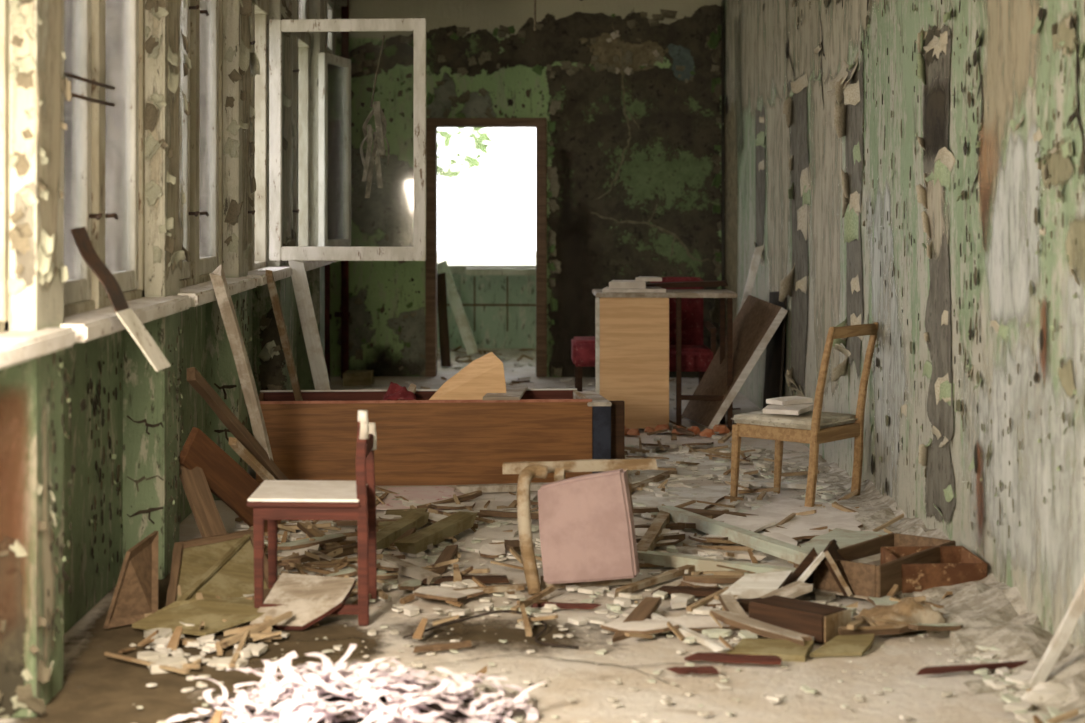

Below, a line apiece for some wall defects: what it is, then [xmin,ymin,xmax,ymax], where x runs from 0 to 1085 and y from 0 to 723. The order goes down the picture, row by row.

peeling [7,0,72,297]
peeling [145,0,192,279]
peeling [281,0,296,247]
leakage [548,154,593,374]
peeling [336,0,1085,604]
spalling [0,351,122,719]
peeling [493,594,560,626]
peeling [653,590,668,614]
peeling [649,628,758,650]
peeling [965,645,1066,723]